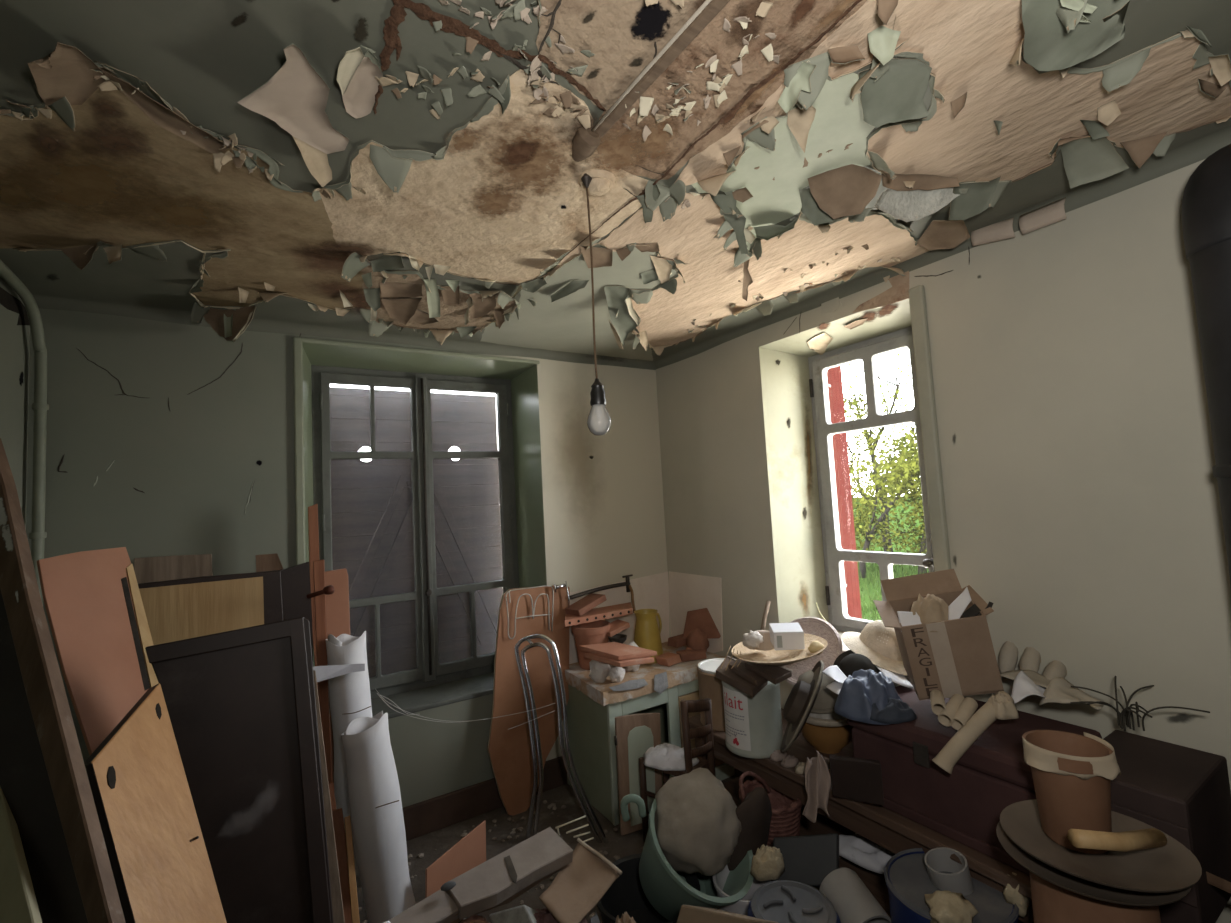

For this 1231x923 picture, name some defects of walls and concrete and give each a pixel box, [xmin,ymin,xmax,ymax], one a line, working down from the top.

crack [373,0,606,114]
water stain [0,98,233,234]
peeling [0,0,1231,355]
crack [471,0,862,285]
crack [78,343,243,412]